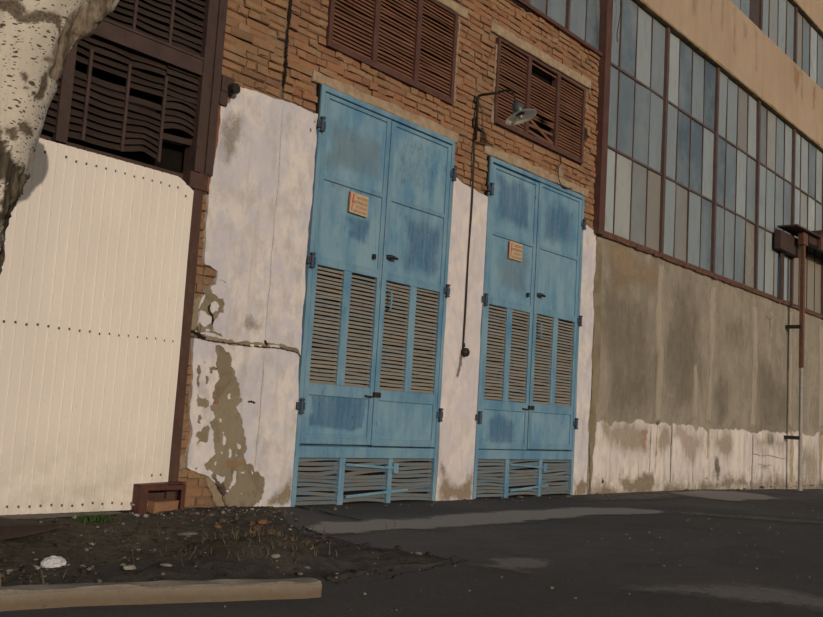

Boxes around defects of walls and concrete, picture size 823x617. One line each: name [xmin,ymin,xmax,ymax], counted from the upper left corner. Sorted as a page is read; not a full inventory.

peeling [179,282,264,507]
leakage [610,245,716,422]
peeling [660,426,699,460]
peeling [717,435,731,454]
leakage [750,306,792,427]